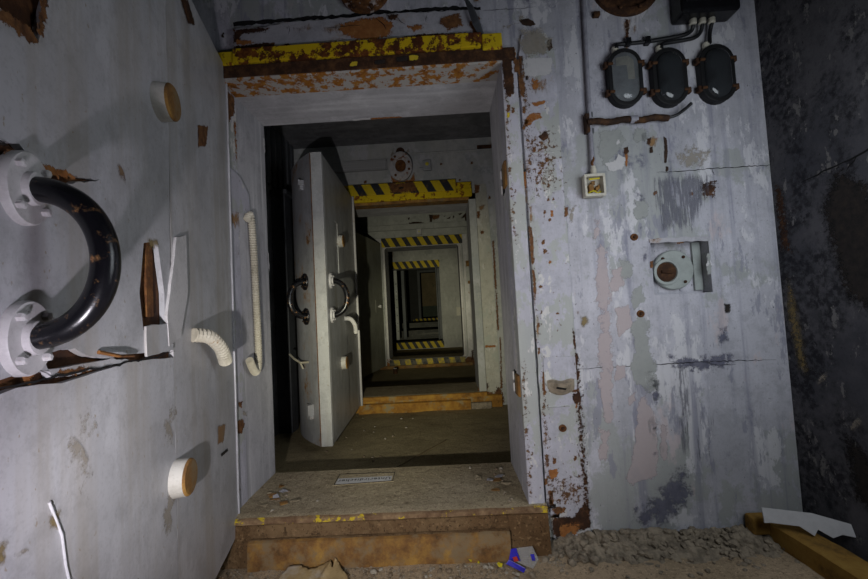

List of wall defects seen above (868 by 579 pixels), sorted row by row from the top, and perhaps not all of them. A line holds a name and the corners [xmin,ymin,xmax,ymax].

corrosion [440,13,482,32]
corrosion [502,55,591,539]
peeling [594,219,633,461]
peeling [630,283,659,393]
water stain [669,354,732,449]
water stain [634,472,691,525]